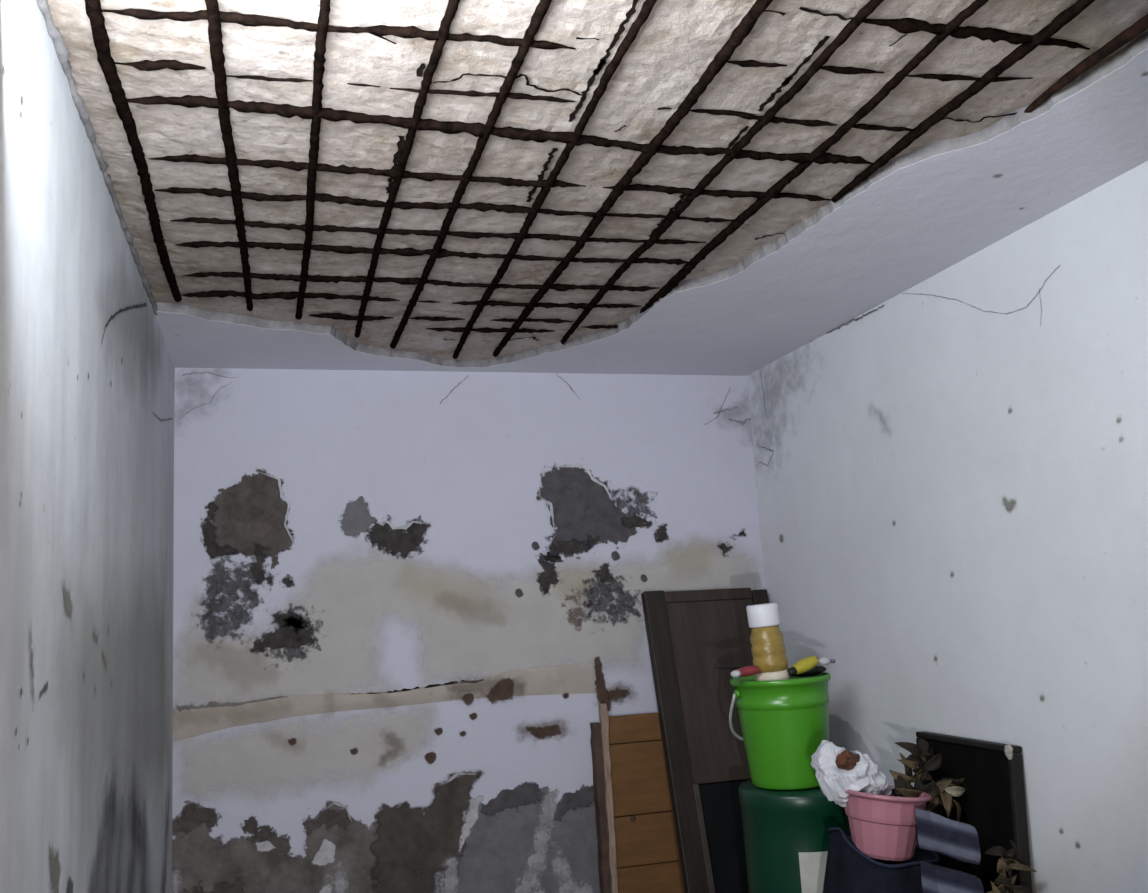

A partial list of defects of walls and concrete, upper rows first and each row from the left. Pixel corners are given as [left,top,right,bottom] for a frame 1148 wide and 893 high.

spalling [36,0,1148,367]
crack [102,302,147,343]
crack [810,265,1060,342]
peeling [197,469,295,642]
peeling [339,496,431,558]
peeling [531,464,669,634]
peeling [718,531,746,556]
damp [181,546,755,703]
damp [186,712,429,792]
peeling [172,770,600,893]